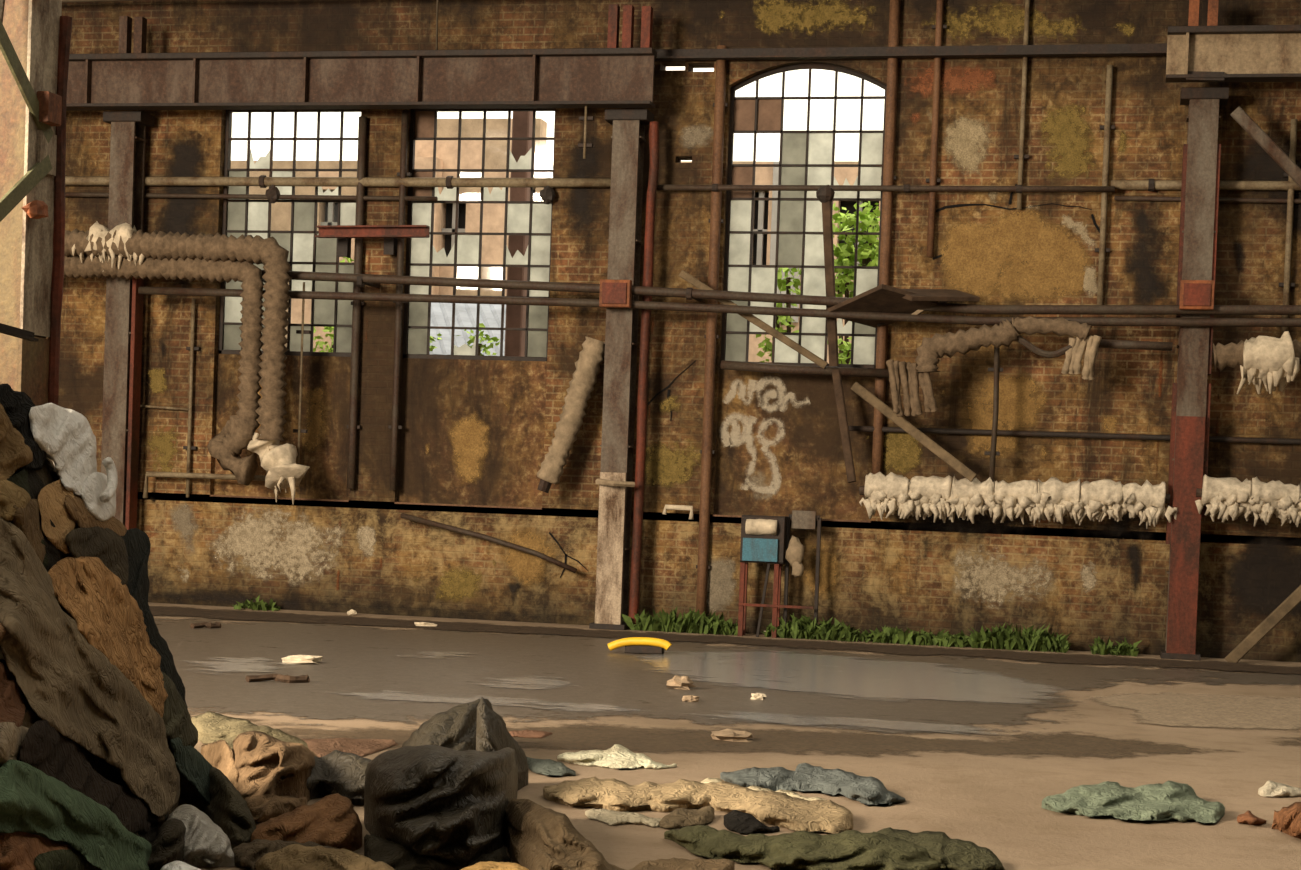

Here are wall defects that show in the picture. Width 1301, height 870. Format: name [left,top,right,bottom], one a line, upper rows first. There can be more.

peeling [945,117,989,171]
peeling [941,206,1098,301]
leakage [1123,201,1167,318]